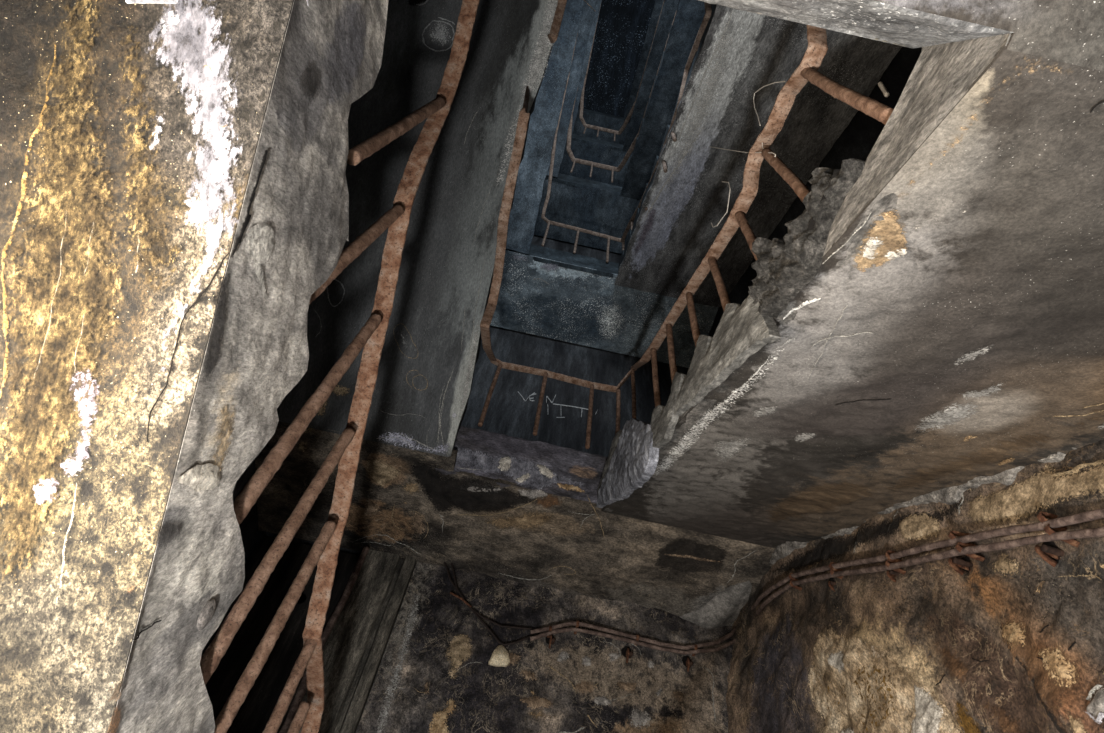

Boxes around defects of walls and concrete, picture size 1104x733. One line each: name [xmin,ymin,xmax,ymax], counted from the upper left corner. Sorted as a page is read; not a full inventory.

damp [299,62,320,102]
flaking render [853,210,917,272]
damp [0,0,242,609]
crack [146,150,268,442]
flaking render [596,158,865,508]
corrosion [211,403,235,471]
spalling [367,459,547,539]
peeling [557,483,584,492]